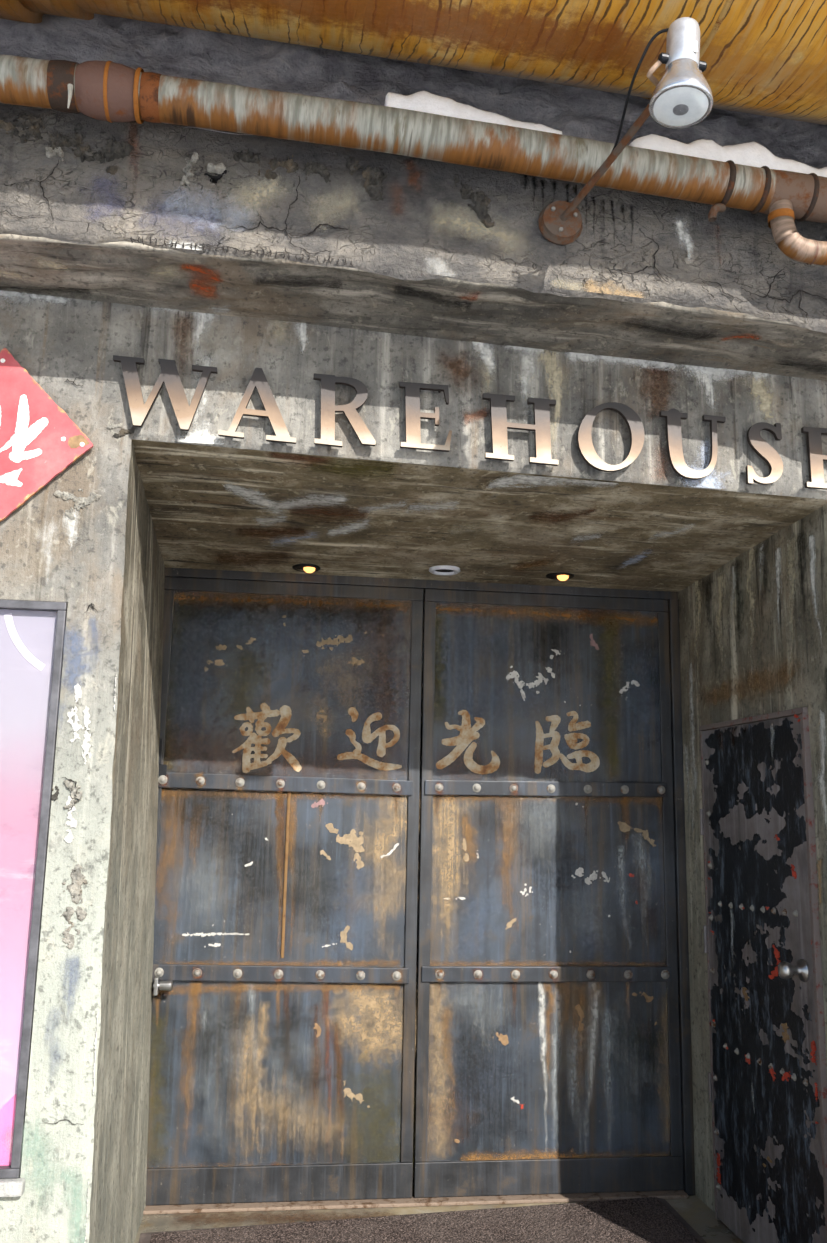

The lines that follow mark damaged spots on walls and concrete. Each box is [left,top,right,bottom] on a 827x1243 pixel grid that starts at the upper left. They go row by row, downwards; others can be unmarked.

rust [47,60,81,113]
crack [0,160,59,220]
crack [128,176,353,266]
crack [598,232,827,324]
peeling [204,637,256,672]
peeling [302,631,385,666]
peeling [506,649,561,701]
water stain [690,531,821,784]
water stain [818,711,827,823]
rust [433,783,475,926]
rust [314,980,403,1128]
water stain [539,982,611,1104]